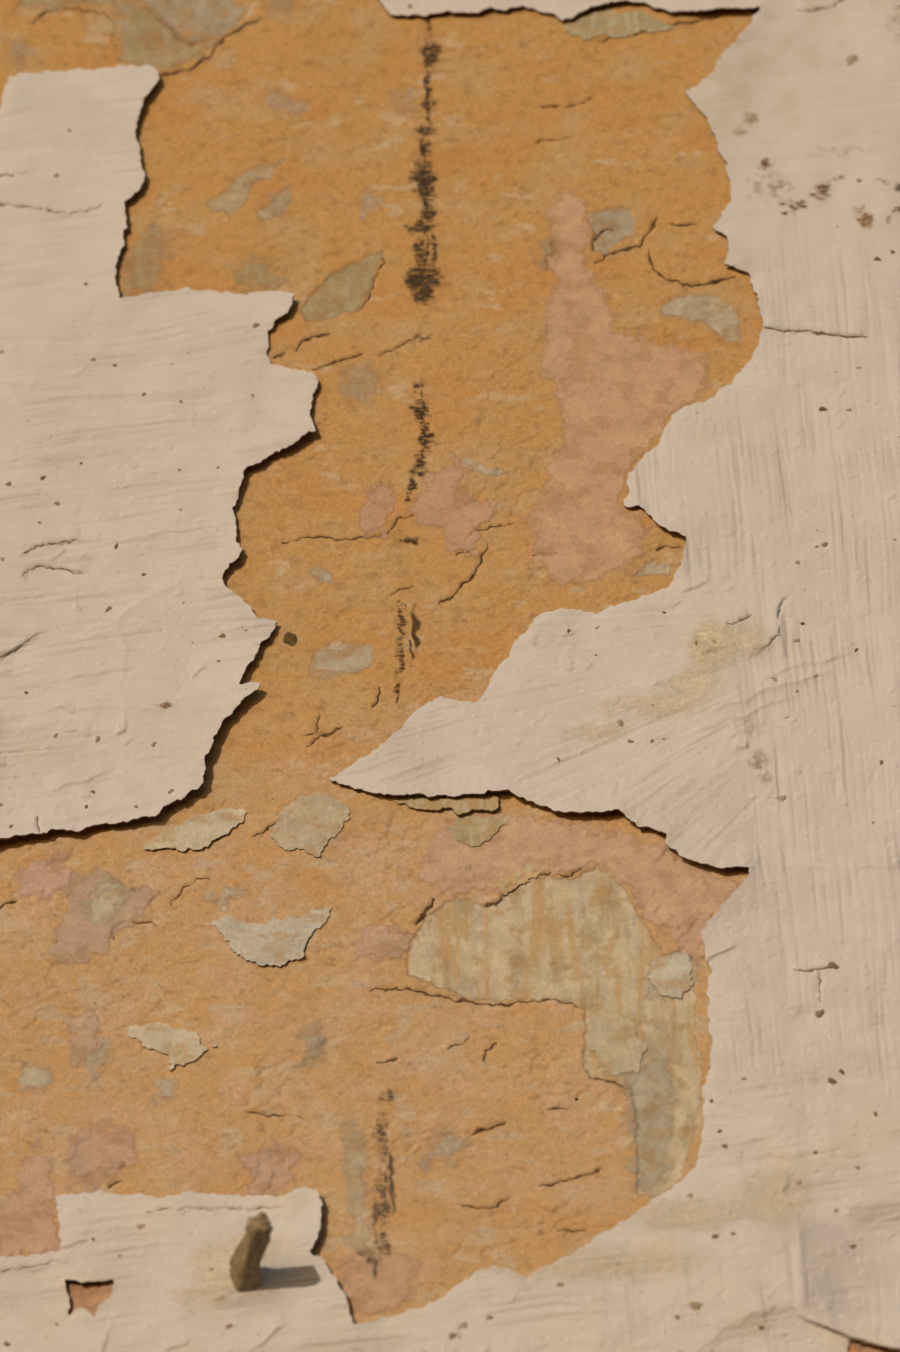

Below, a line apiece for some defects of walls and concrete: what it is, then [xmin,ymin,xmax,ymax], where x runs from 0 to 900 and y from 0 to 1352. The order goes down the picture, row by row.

spalling [662,295,740,341]
peeling [528,193,707,587]
peeling [0,64,318,840]
peeling [409,452,493,556]
crack [390,522,514,603]
peeling [144,808,247,852]
peeling [269,791,350,858]
peeling [211,907,331,967]
peeling [354,924,413,962]
peeling [391,791,749,1197]
spalling [65,1281,114,1316]
peeling [342,1249,416,1315]